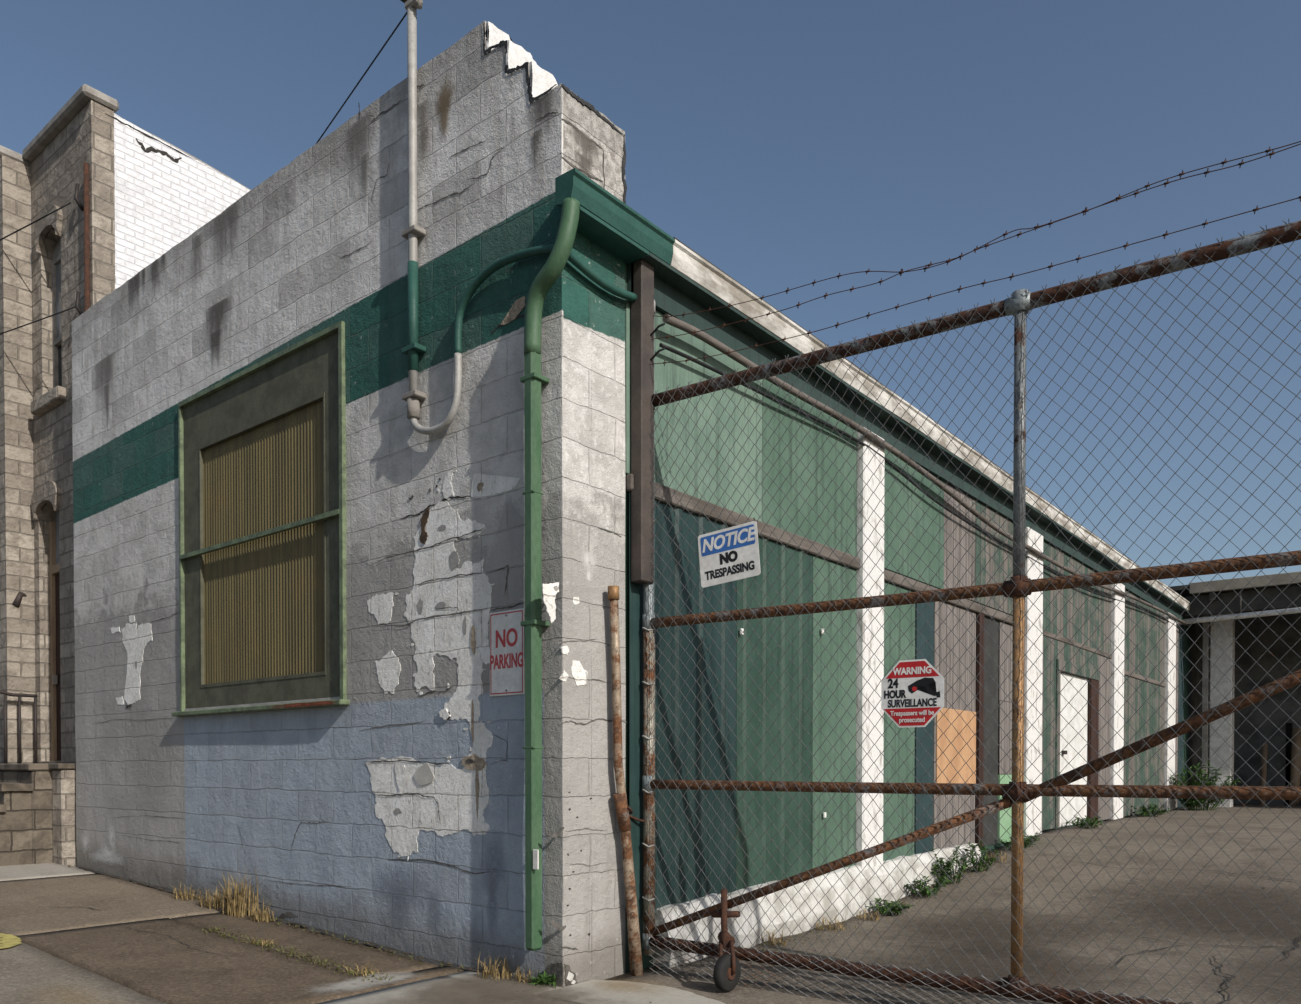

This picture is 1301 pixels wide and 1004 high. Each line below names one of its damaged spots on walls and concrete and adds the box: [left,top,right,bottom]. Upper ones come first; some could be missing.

crack [358,84,426,122]
crack [105,113,194,163]
crack [418,141,504,210]
peeling [542,582,580,623]
peeling [110,615,153,708]
peeling [366,468,520,861]
peeling [558,645,588,686]